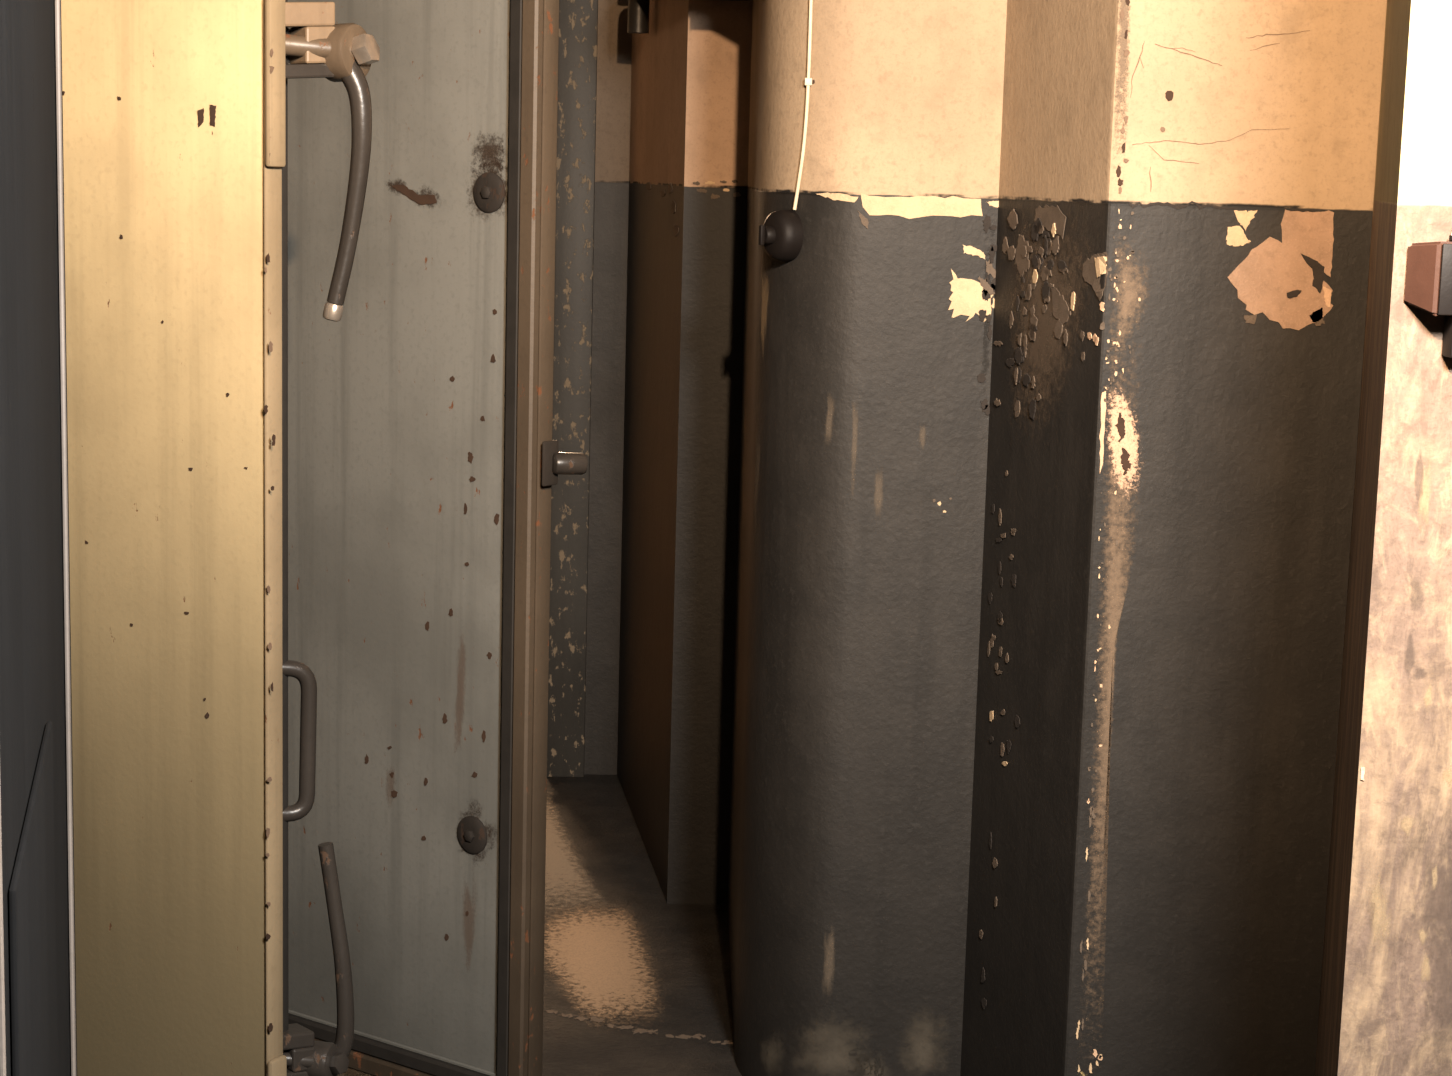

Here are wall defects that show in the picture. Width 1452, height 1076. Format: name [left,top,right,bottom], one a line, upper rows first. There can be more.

peeling [1226,210,1334,330]
peeling [817,0,1146,993]
spalling [1077,1049,1103,1076]